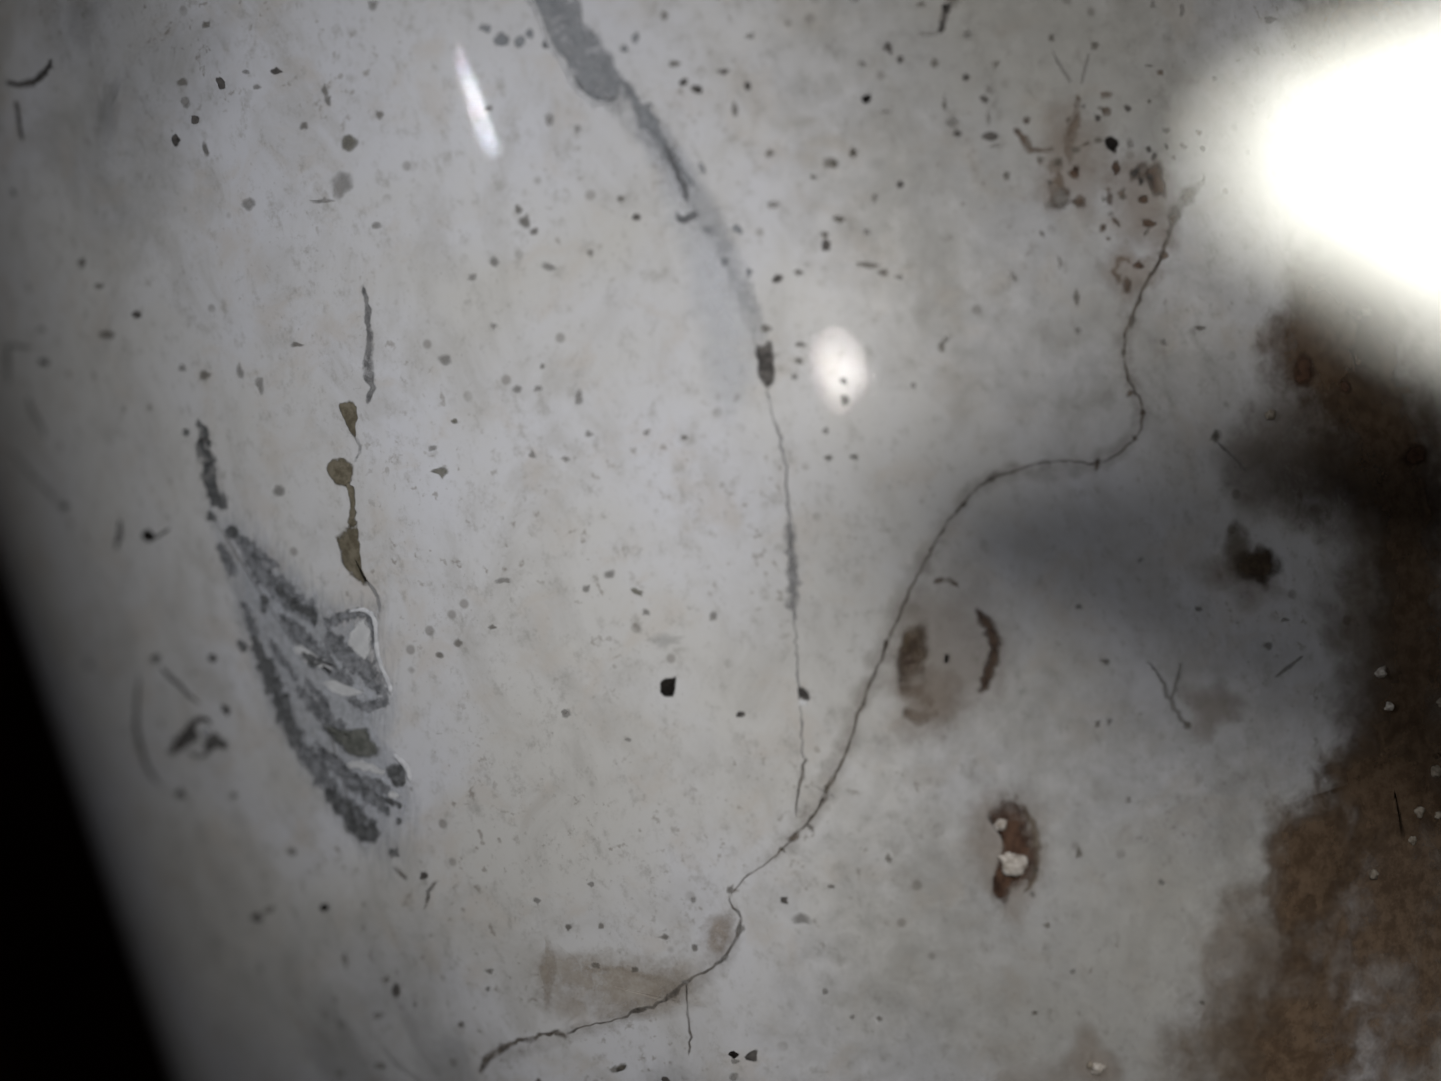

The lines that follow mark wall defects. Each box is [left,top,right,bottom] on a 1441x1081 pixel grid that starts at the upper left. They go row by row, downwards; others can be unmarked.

crack [481,176,1205,1070]
rust [898,629,938,722]
rust [976,610,1001,692]